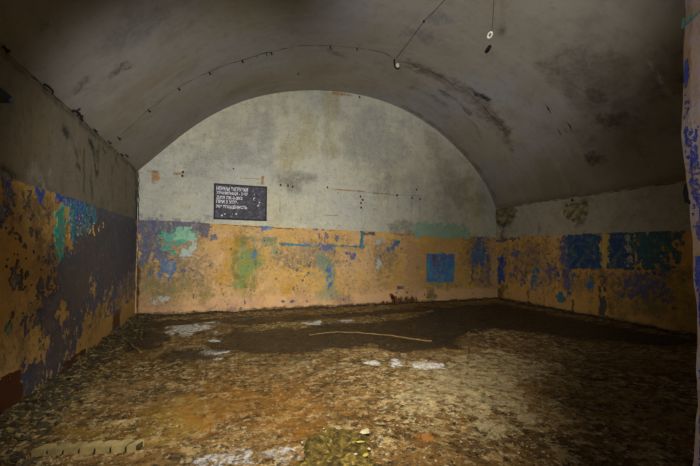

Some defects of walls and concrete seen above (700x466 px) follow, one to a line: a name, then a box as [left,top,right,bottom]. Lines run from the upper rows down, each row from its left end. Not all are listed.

peeling [683,94,700,188]
peeling [5,179,214,397]
peeling [315,229,390,257]
peeling [456,237,491,286]
peeling [500,235,582,301]
peeling [586,231,685,311]